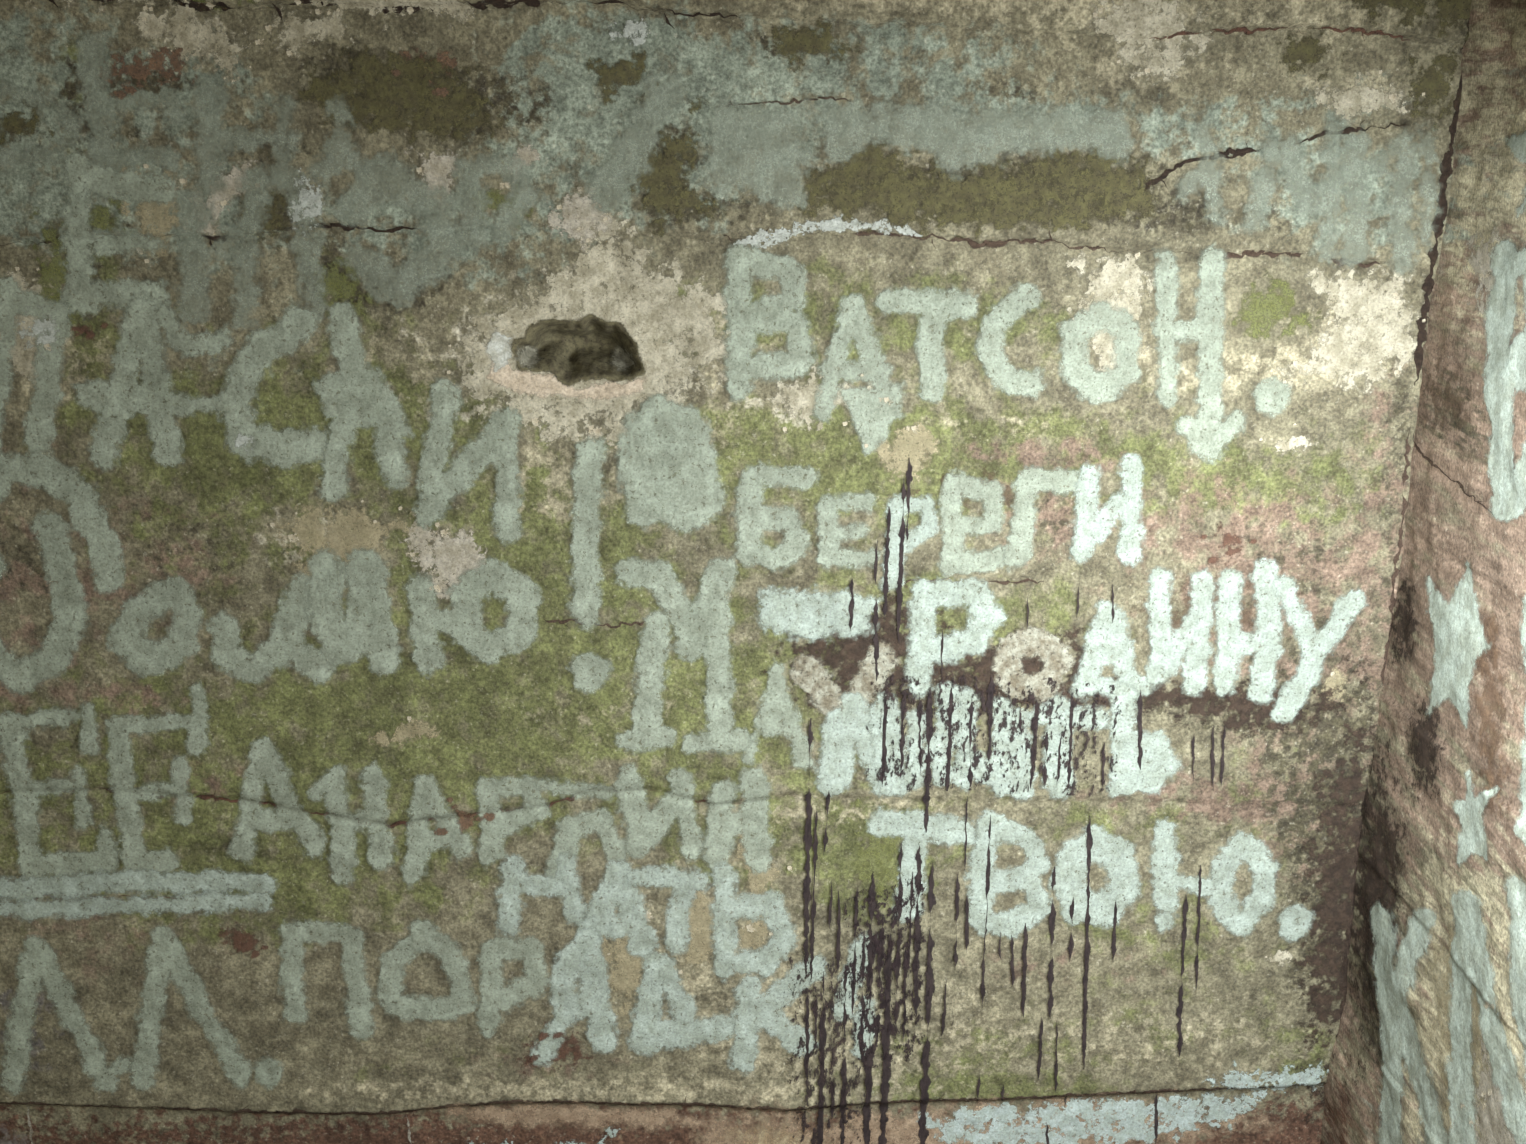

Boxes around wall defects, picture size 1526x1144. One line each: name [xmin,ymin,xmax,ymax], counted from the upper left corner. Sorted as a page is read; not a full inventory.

crack [174,0,740,28]
crack [1149,26,1407,41]
crack [1145,120,1406,191]
crack [724,226,1384,268]
spalling [447,186,731,449]
crack [1381,20,1492,685]
leakage [776,458,1447,1144]